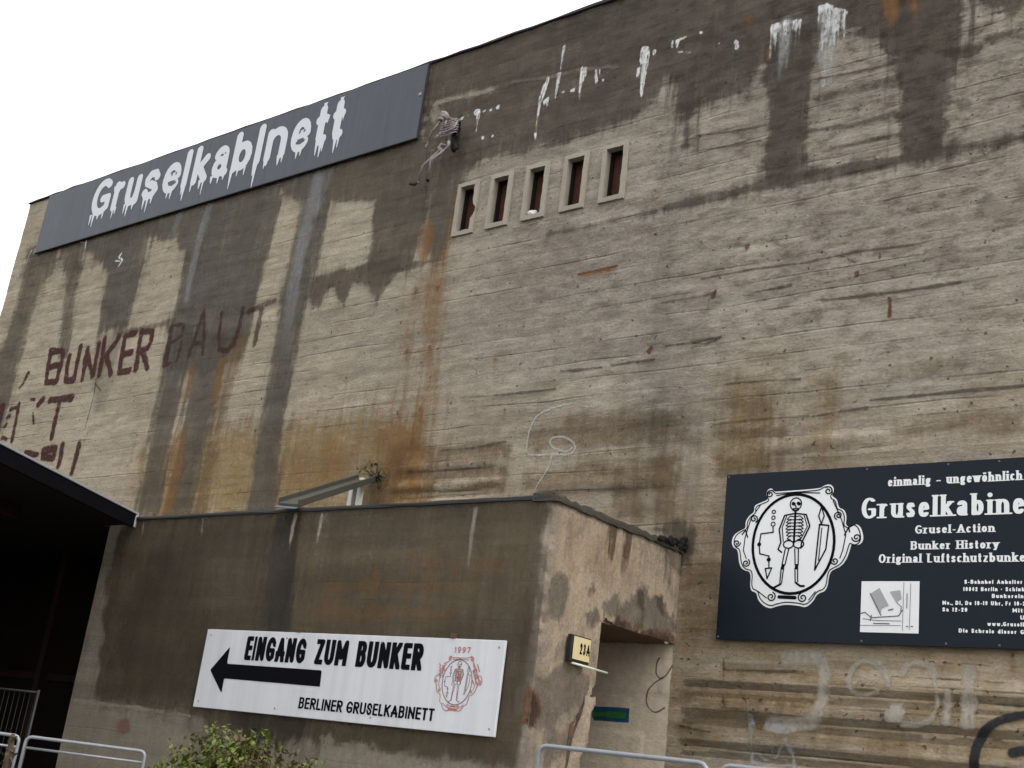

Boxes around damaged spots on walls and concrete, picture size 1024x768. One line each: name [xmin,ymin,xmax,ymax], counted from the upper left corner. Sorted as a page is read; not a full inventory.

leakage [970,0,1022,17]
leakage [967,135,1013,151]
leakage [0,0,963,516]
leakage [609,524,632,560]
leakage [71,501,549,768]